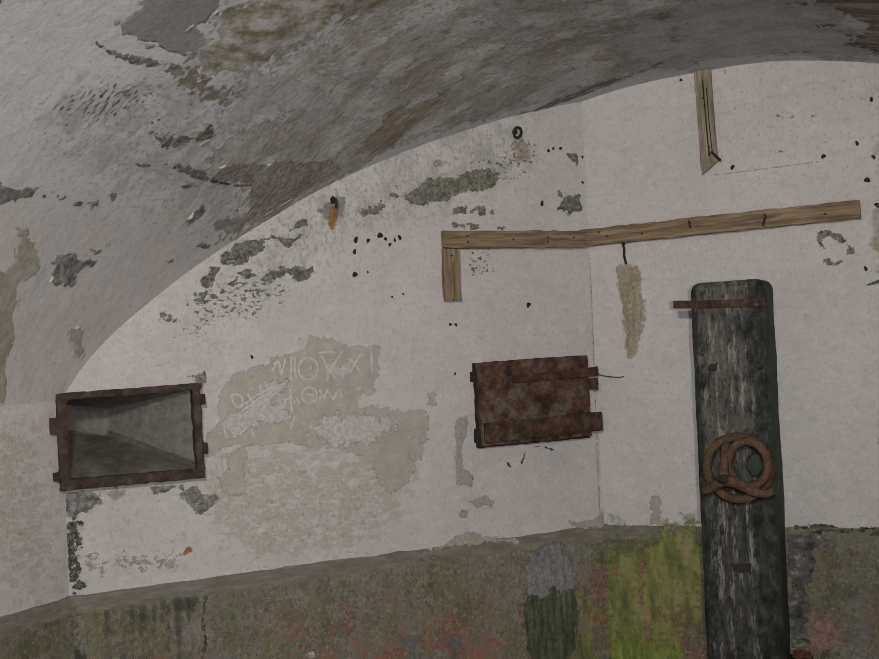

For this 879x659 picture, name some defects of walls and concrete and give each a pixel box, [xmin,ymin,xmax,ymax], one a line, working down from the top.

spalling [95,0,225,69]
peeling [0,182,101,211]
peeling [146,0,693,339]
peeling [0,226,107,403]
peeling [150,335,437,515]
water stain [67,516,87,595]
water stain [522,540,579,659]